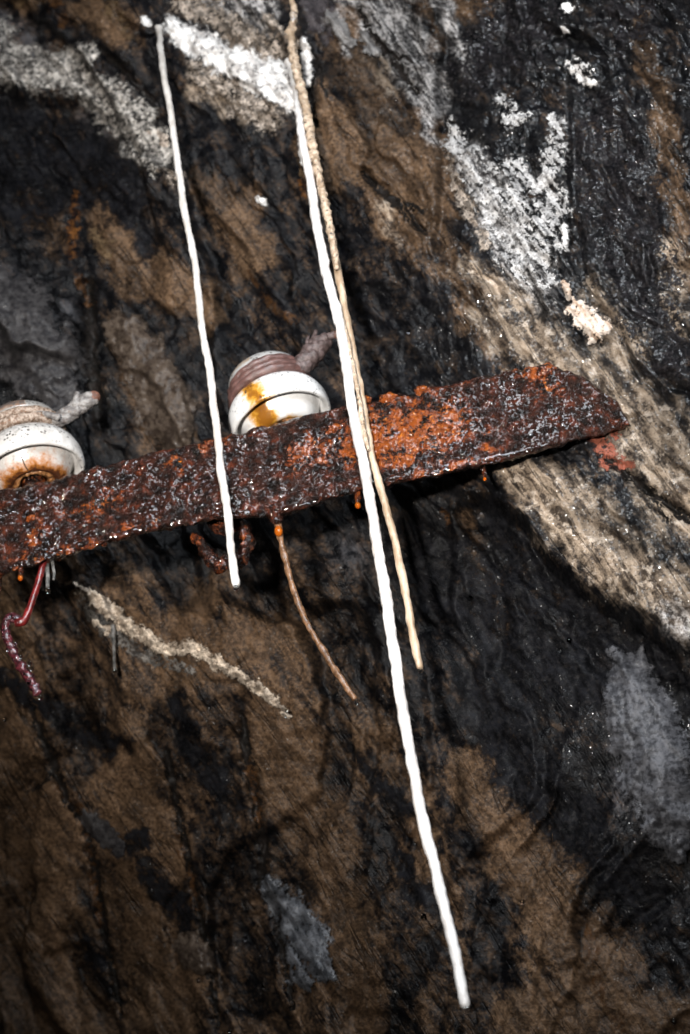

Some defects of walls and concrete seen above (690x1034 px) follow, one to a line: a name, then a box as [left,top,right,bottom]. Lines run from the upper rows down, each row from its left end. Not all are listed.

leakage [104,0,335,136]
leakage [0,0,186,268]
leakage [437,0,690,395]
rust [356,391,399,404]
rust [414,385,430,396]
rust [478,397,496,410]
rust [200,438,214,450]
rust [267,418,636,525]
rust [52,509,253,552]